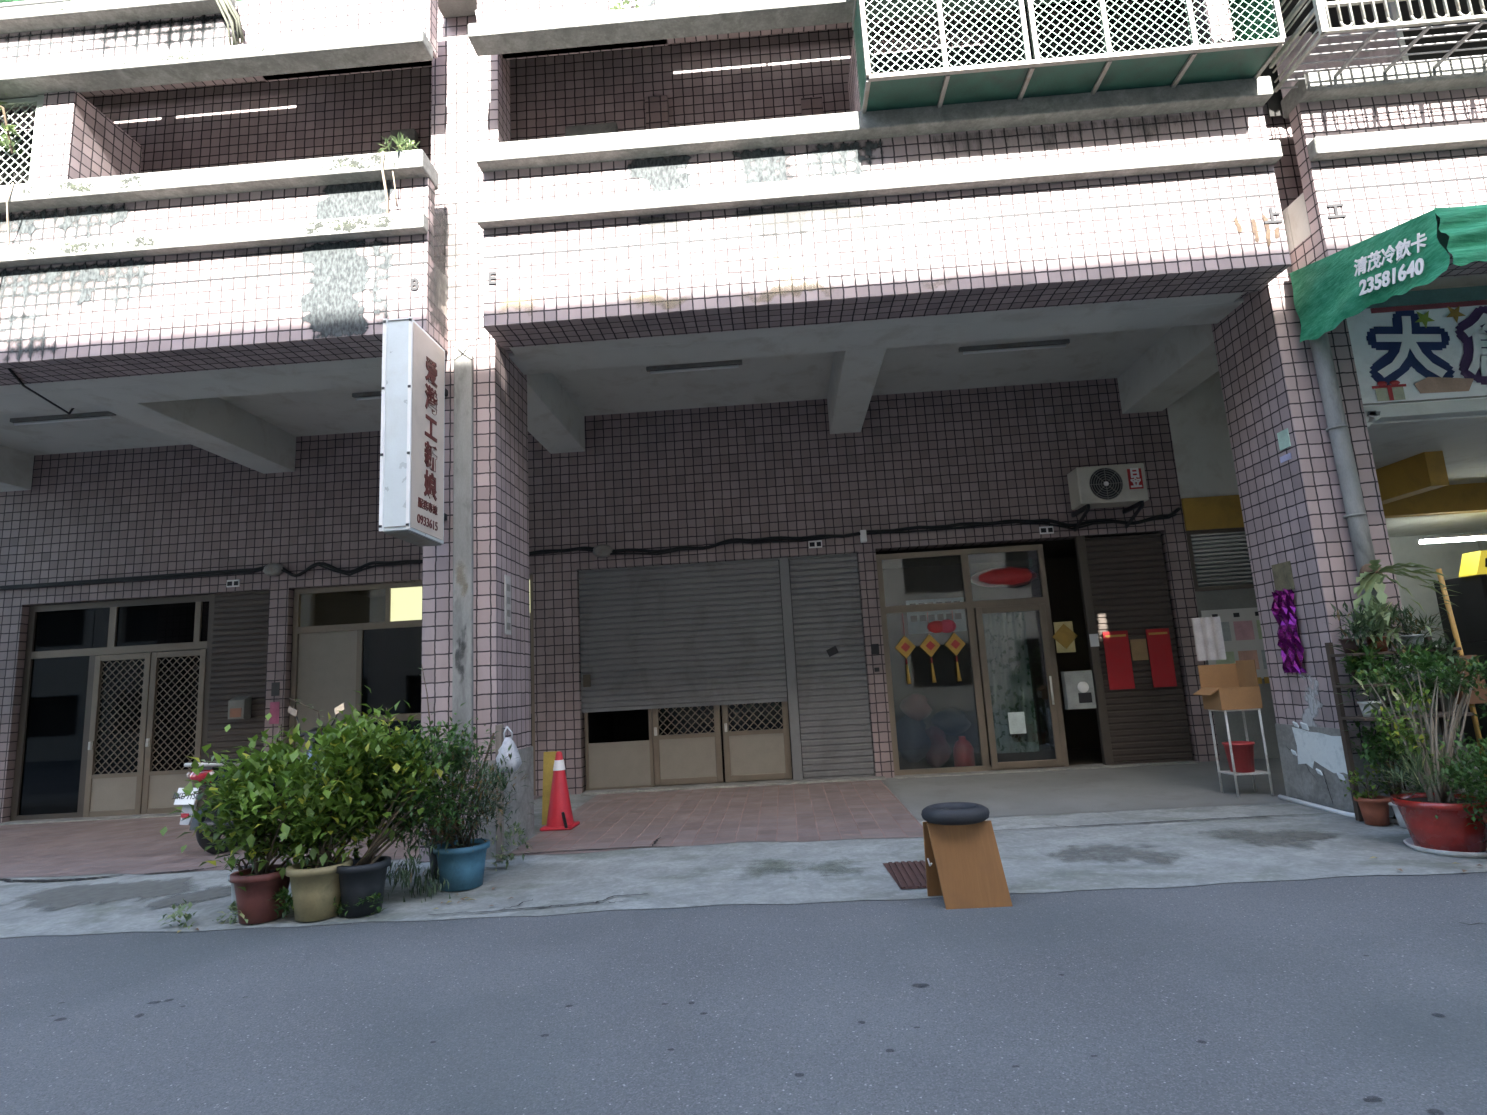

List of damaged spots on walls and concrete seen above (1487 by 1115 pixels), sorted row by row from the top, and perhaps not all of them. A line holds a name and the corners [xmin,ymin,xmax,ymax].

peeling [1291,721,1348,781]